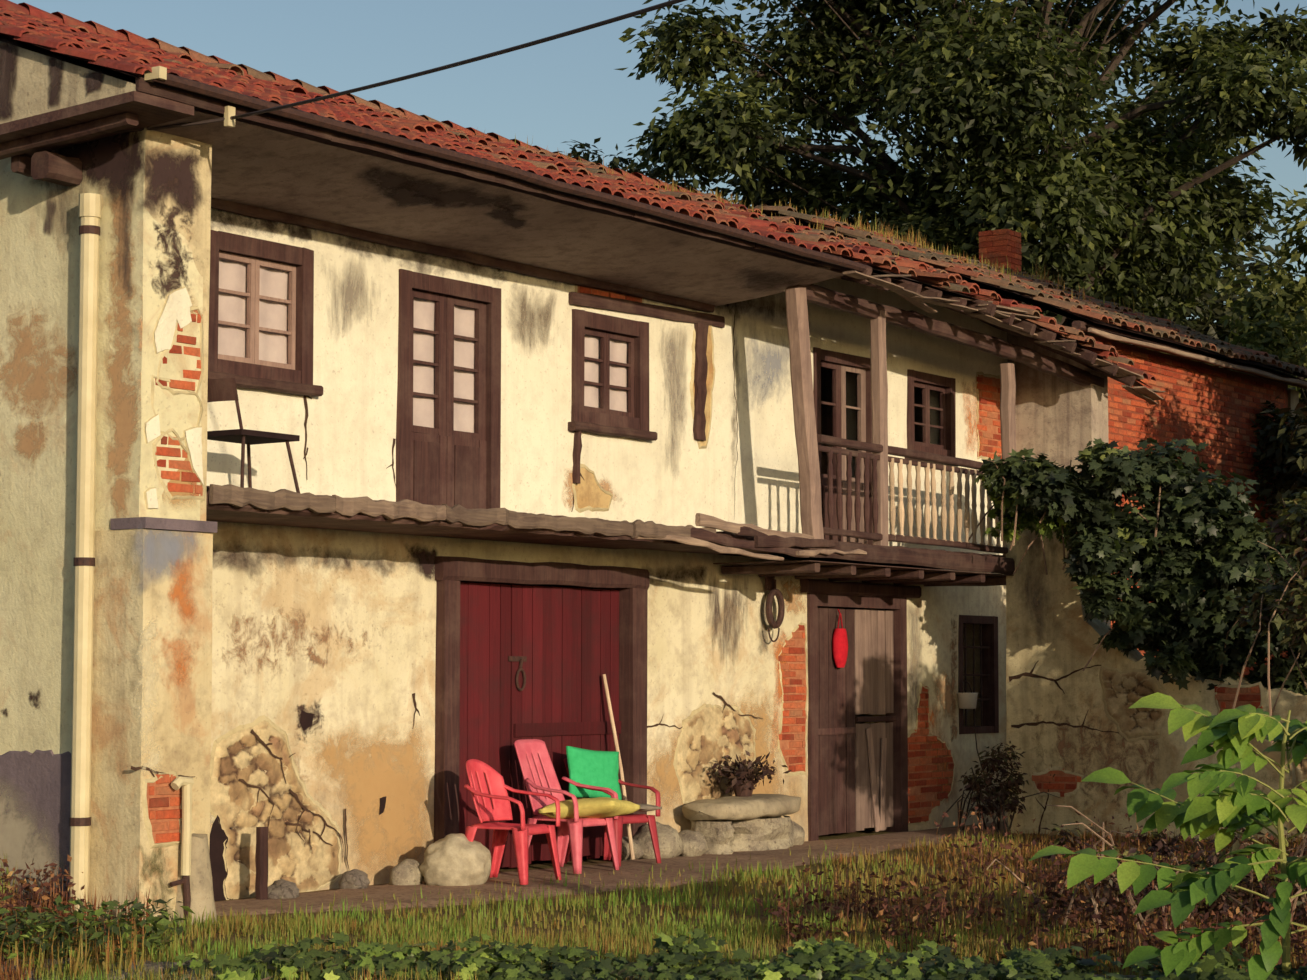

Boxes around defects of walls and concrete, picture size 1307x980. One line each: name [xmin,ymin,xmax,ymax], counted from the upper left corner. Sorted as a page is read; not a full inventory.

leakage [50,131,201,296]
leakage [213,210,500,272]
leakage [364,168,524,229]
flaking render [139,287,206,509]
flaking render [976,372,1002,460]
peeling [572,463,613,513]
flaking render [741,622,808,794]
flaking render [908,620,958,825]
crack [1009,661,1144,740]
flaking render [142,771,182,849]
peeling [650,750,707,804]
flaking render [1030,766,1085,797]